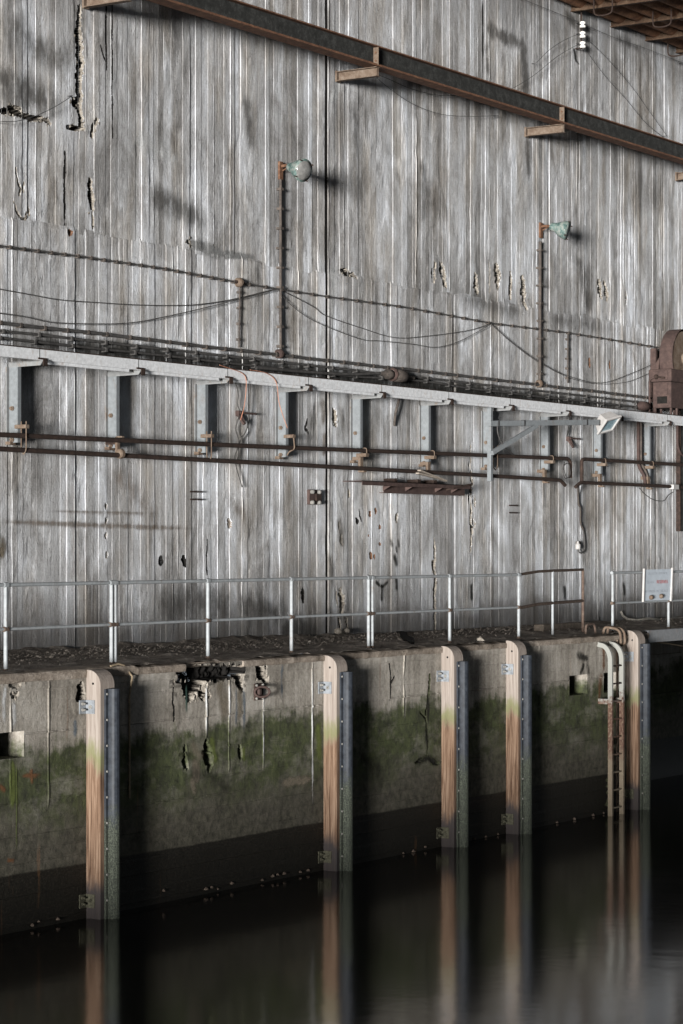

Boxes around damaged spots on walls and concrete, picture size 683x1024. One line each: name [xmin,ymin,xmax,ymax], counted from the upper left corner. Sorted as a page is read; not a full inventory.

spalling [87,177,95,230]
spalling [431,260,447,289]
spalling [473,260,528,311]
spalling [597,279,609,301]
spalling [173,662,269,705]
water stain [283,683,321,787]
crack [414,673,440,766]